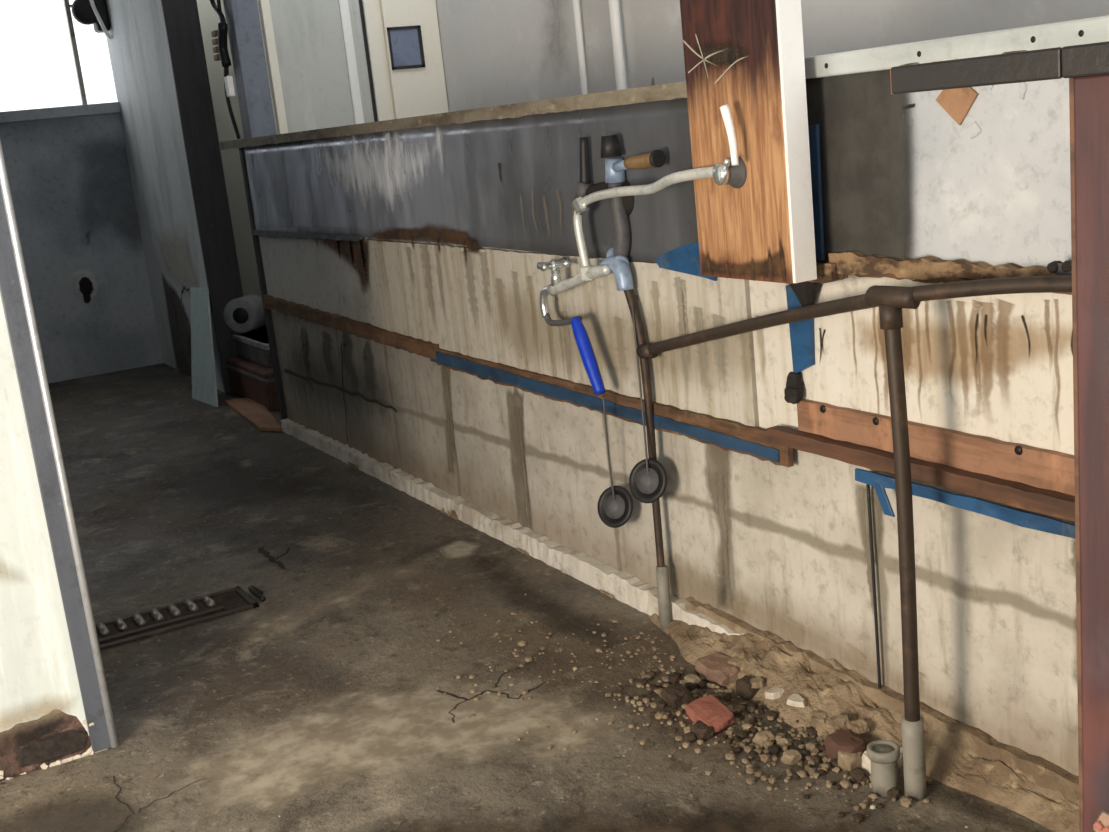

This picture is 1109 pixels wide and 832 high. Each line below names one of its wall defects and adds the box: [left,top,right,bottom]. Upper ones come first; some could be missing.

corrosion [316,226,479,289]
water stain [515,407,531,526]
spalling [0,717,107,781]